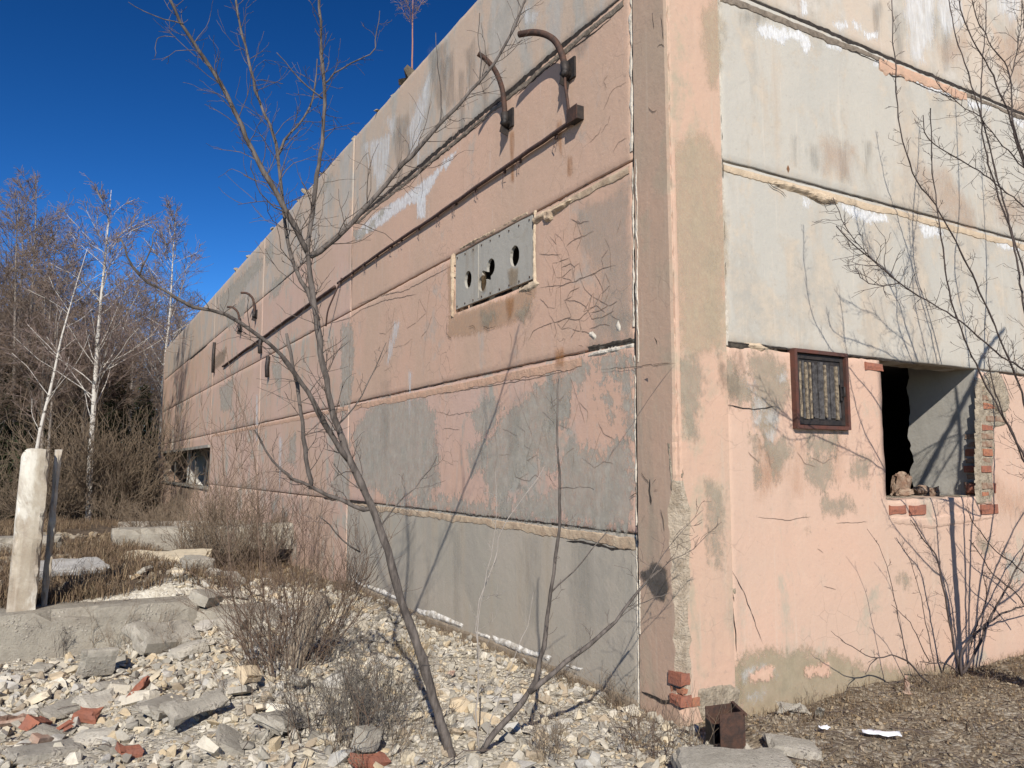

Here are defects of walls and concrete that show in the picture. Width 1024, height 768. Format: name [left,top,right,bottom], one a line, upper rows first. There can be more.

peeling [339,319,355,408]
peeling [332,351,637,537]
crack [324,0,674,630]
flaking render [889,372,1010,529]